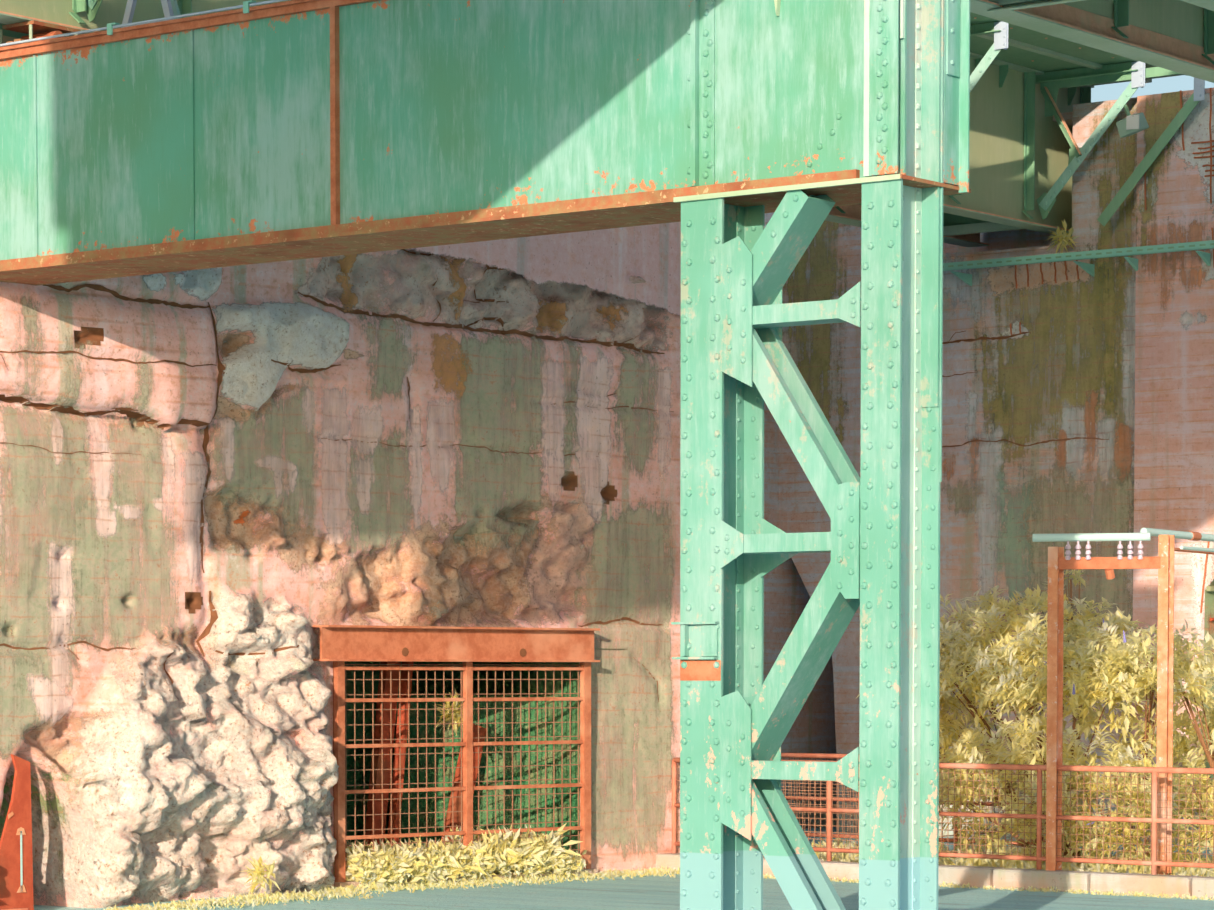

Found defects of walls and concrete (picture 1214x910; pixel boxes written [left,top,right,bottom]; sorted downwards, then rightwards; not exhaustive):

spalling [1173,88,1214,212]
leakage [86,415,117,538]
leakage [160,437,207,583]
spalling [214,383,299,422]
crack [271,359,341,373]
crack [318,377,599,457]
crack [298,249,665,354]
crack [943,331,1031,344]
leakage [965,335,1010,602]
leakage [1060,257,1136,482]
leakage [27,542,75,725]
spalling [1191,541,1214,632]